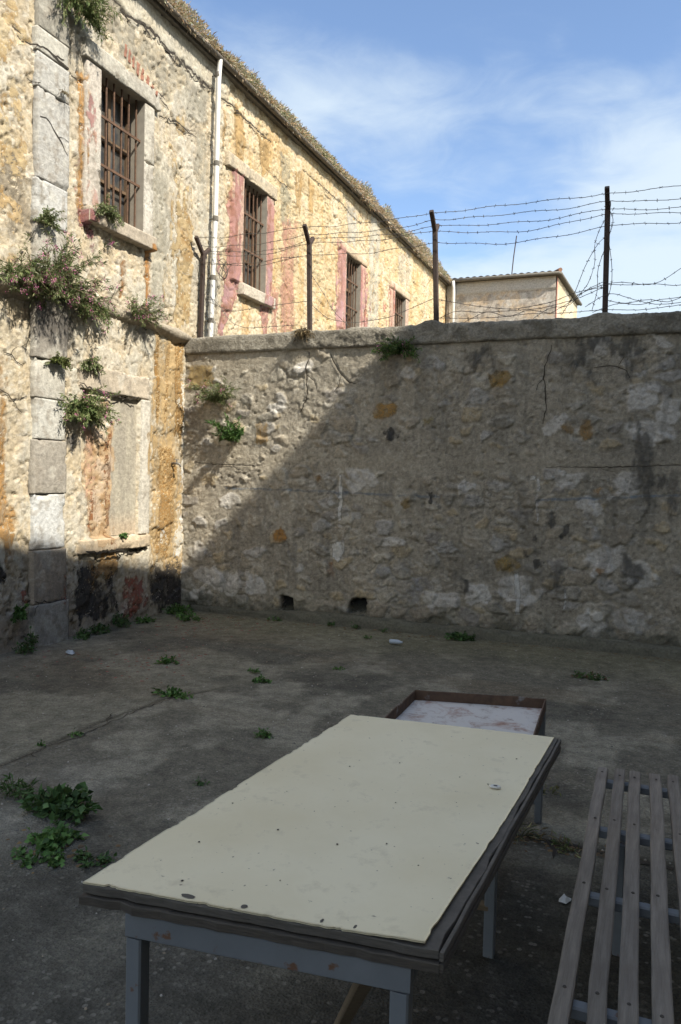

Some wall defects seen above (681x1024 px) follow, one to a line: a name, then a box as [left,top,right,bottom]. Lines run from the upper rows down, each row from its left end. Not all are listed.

crack [536,345,552,420]
leakage [635,422,667,506]